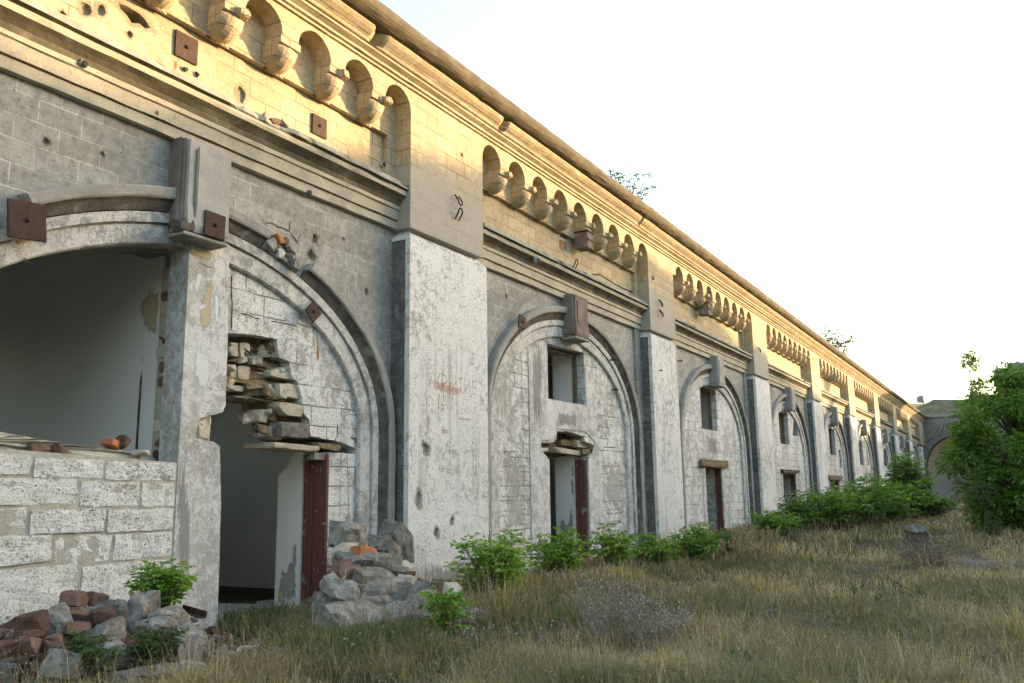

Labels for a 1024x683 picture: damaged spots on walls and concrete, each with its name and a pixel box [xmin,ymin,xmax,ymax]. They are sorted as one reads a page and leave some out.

flaking render [195,274,219,327]
flaking render [226,342,309,441]